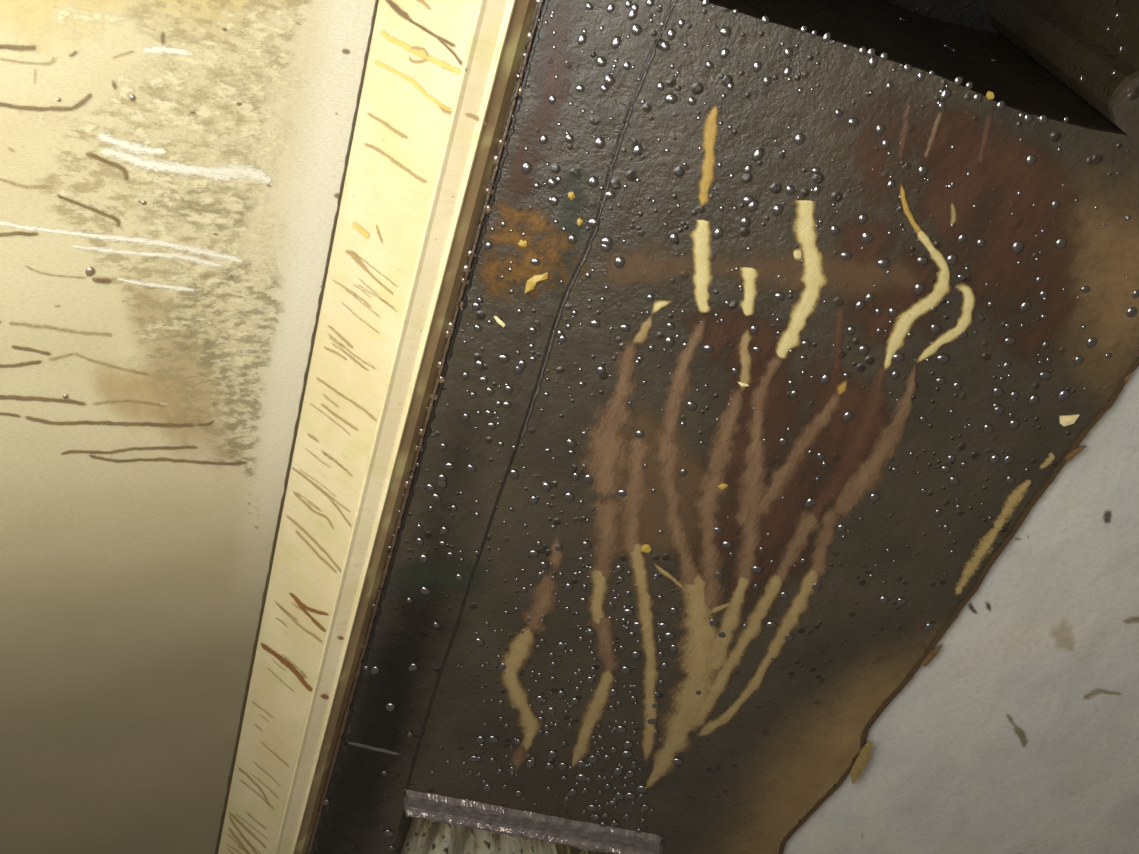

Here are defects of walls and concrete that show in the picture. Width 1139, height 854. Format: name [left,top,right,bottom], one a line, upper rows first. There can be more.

crack [0,45,132,111]
water stain [699,106,718,206]
corrosion [843,221,893,268]
corrosion [855,104,1139,376]
crack [0,323,146,374]
crack [0,395,247,466]
corrosion [596,255,933,598]
water stain [572,186,974,789]
peeling [956,480,1031,594]
peeling [1040,446,1087,468]
peeling [1059,414,1079,427]
water stain [501,540,561,769]